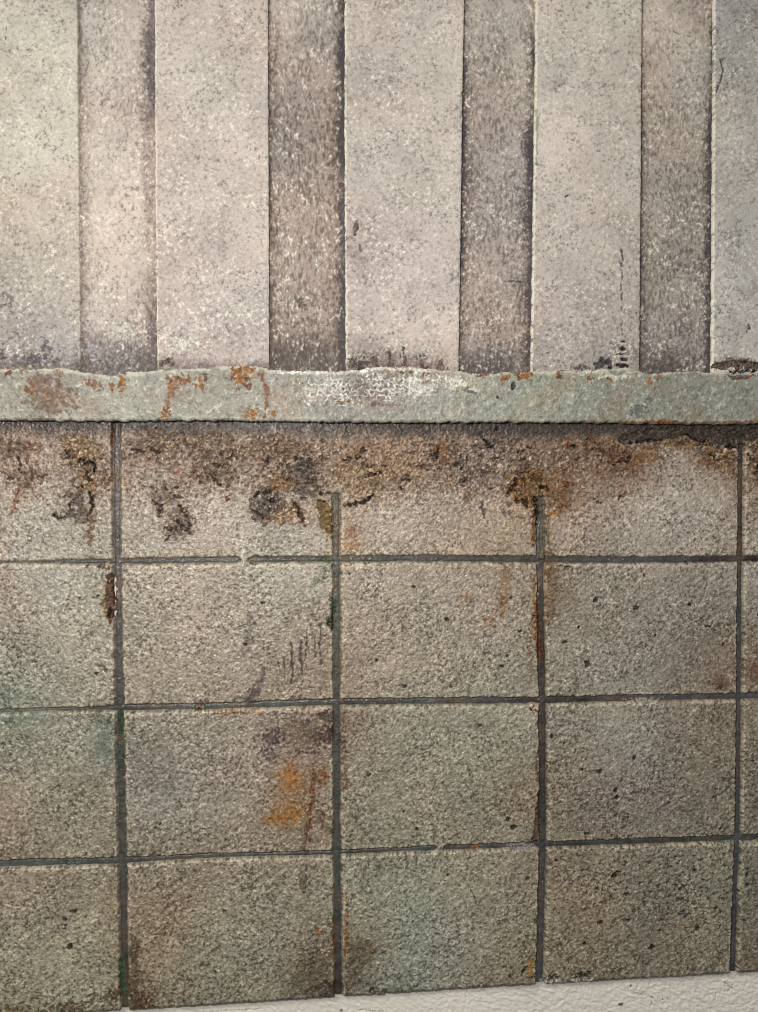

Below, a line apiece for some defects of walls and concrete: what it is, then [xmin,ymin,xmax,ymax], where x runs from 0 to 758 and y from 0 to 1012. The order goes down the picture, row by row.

corrosion [5,368,77,413]
corrosion [87,373,129,392]
corrosion [160,372,208,420]
corrosion [225,365,276,420]
spalling [710,356,758,380]
corrosion [525,456,580,659]
corrosion [262,754,330,841]